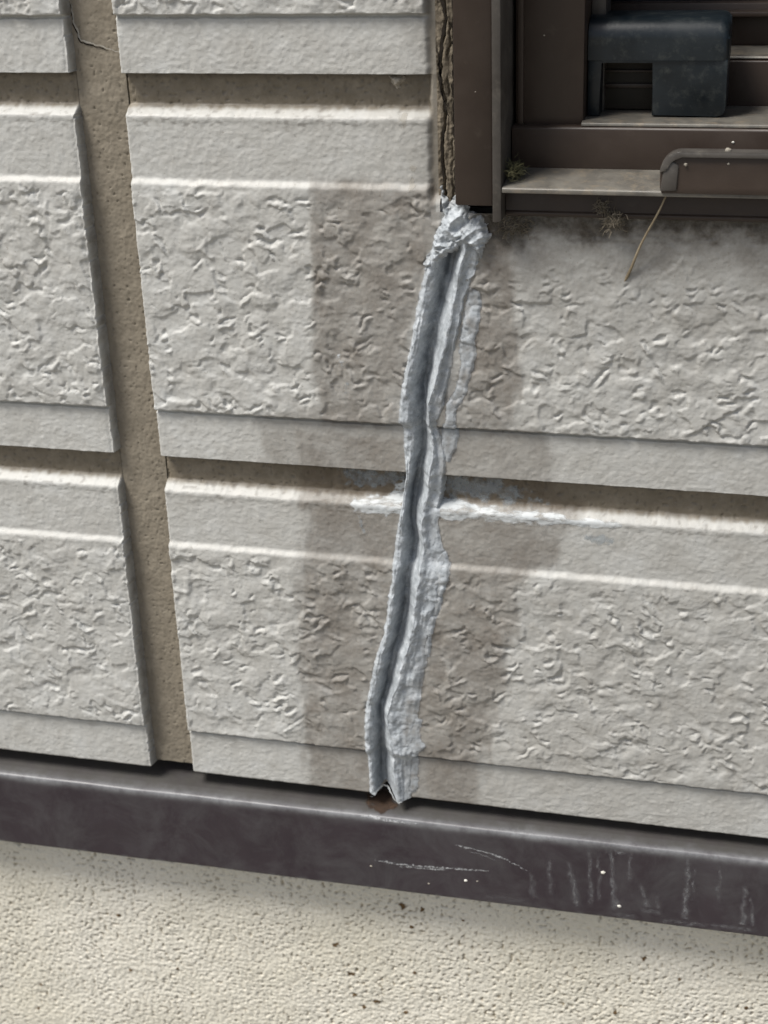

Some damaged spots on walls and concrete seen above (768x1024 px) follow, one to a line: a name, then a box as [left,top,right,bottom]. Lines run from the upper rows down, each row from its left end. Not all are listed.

crack [70,1,119,52]
crack [364,0,492,804]
corrosion [367,789,397,814]